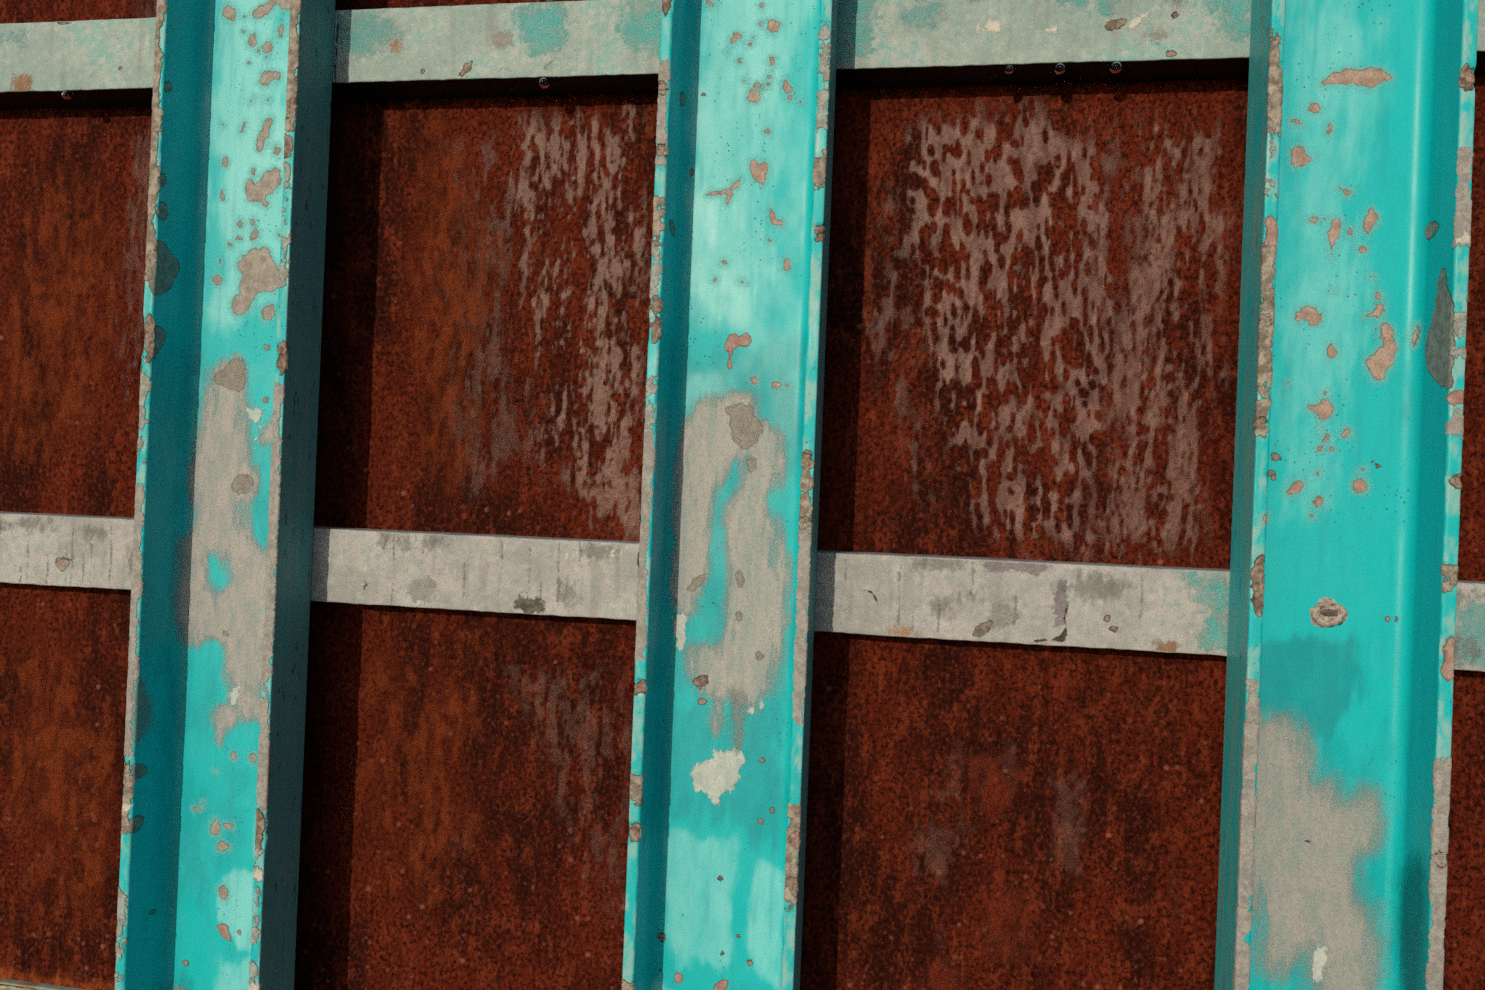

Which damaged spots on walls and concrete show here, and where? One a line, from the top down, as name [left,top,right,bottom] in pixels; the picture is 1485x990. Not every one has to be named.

peeling [212,0,303,321]
spalling [1265,28,1332,167]
corrosion [0,168,119,448]
corrosion [410,123,498,494]
spalling [1253,242,1323,517]
peeling [1365,268,1456,389]
peeling [175,353,273,763]
peeling [670,377,815,806]
corrosion [0,967,115,990]
corrosion [2,639,116,917]
corrosion [344,651,478,905]
peeling [1252,716,1382,990]